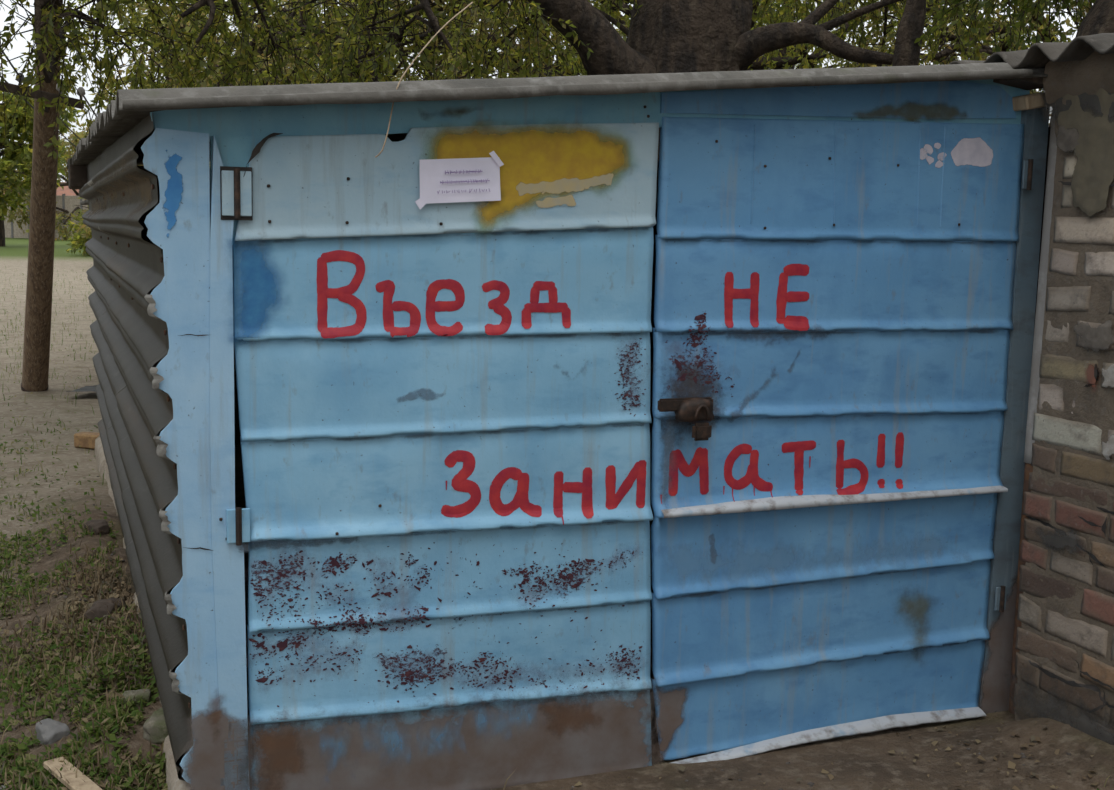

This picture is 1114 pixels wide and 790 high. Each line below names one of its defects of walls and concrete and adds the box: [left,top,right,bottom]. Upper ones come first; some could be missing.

corrosion [614,338,646,416]
corrosion [667,313,735,397]
spalling [1102,364,1114,388]
spalling [1102,434,1114,460]
corrosion [250,550,482,696]
corrosion [500,548,643,644]
corrosion [185,630,687,790]